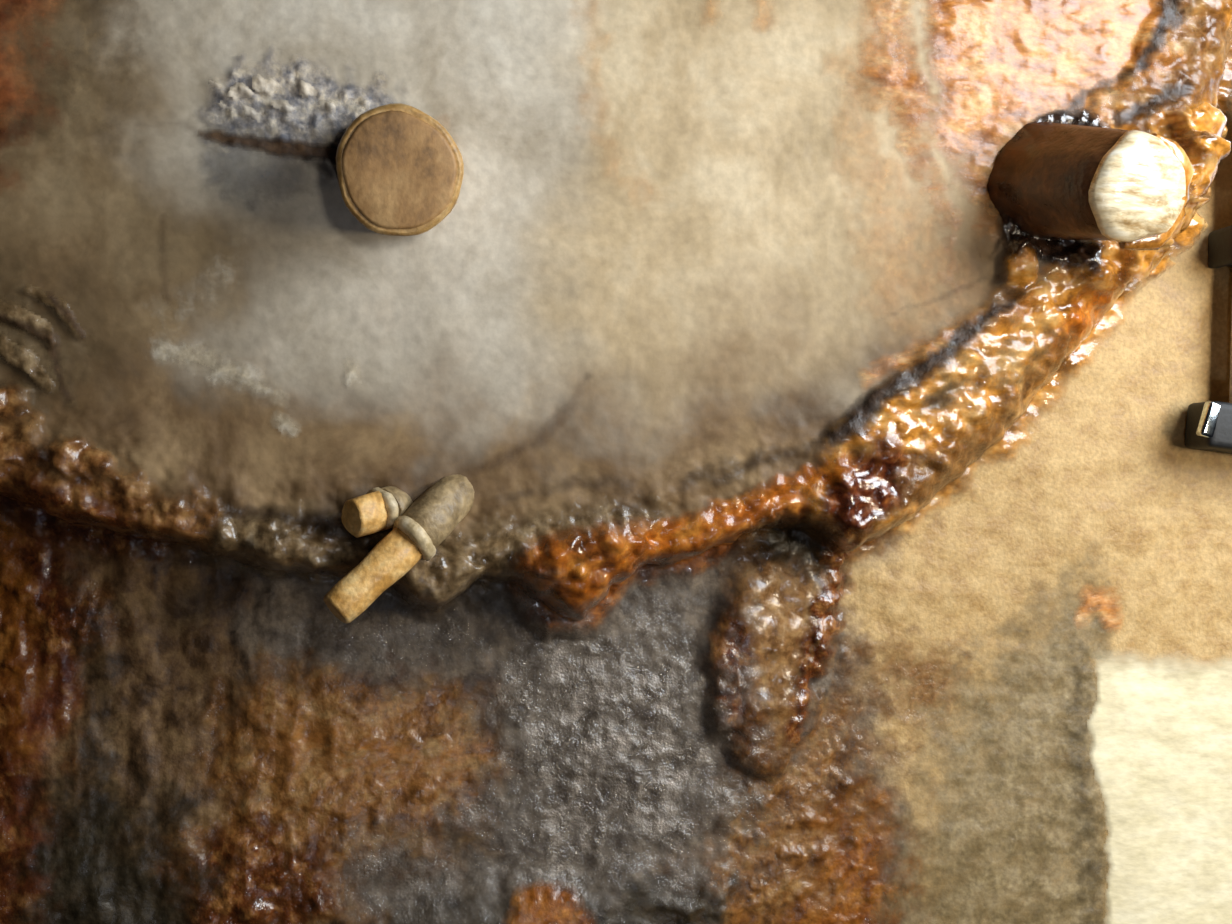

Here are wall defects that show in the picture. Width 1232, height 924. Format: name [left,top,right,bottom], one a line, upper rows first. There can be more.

spalling [201,54,394,151]
corrosion [860,0,1191,217]
corrosion [1118,133,1195,251]
water stain [157,344,267,392]
water stain [0,385,381,584]
corrosion [615,468,840,566]
corrosion [0,478,168,924]
water stain [19,791,221,924]
water stain [294,504,761,924]
corrosion [510,885,593,924]
corrosion [664,693,924,924]
water stain [922,593,1232,924]